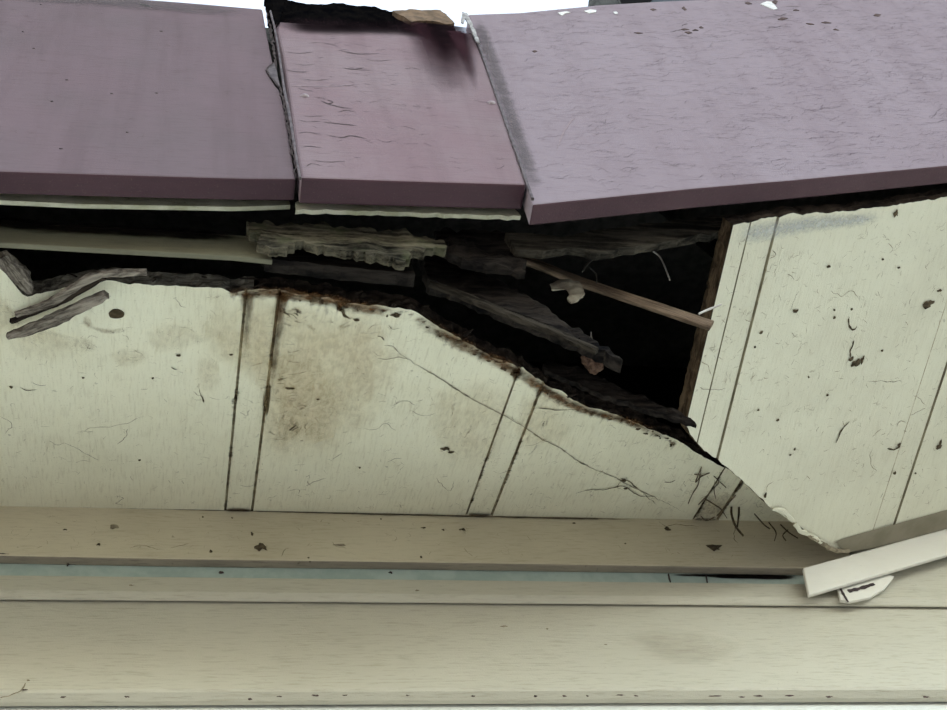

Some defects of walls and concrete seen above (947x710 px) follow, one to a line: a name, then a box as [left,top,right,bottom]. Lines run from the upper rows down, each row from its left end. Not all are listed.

water stain [231,289,676,447]
crack [153,215,947,540]
peeling [772,507,851,553]